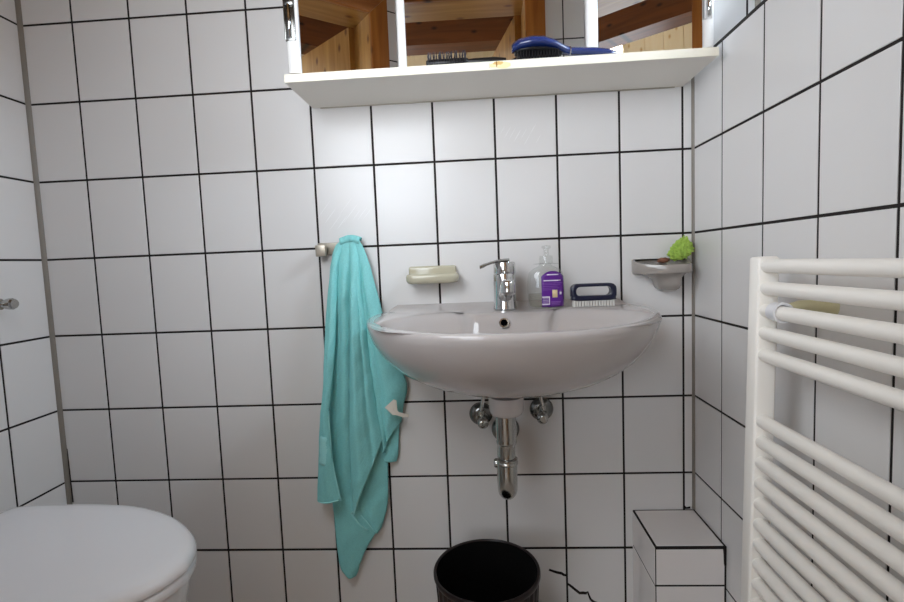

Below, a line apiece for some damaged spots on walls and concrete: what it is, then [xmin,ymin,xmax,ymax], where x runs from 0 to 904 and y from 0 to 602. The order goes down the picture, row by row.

crack [549,569,596,602]